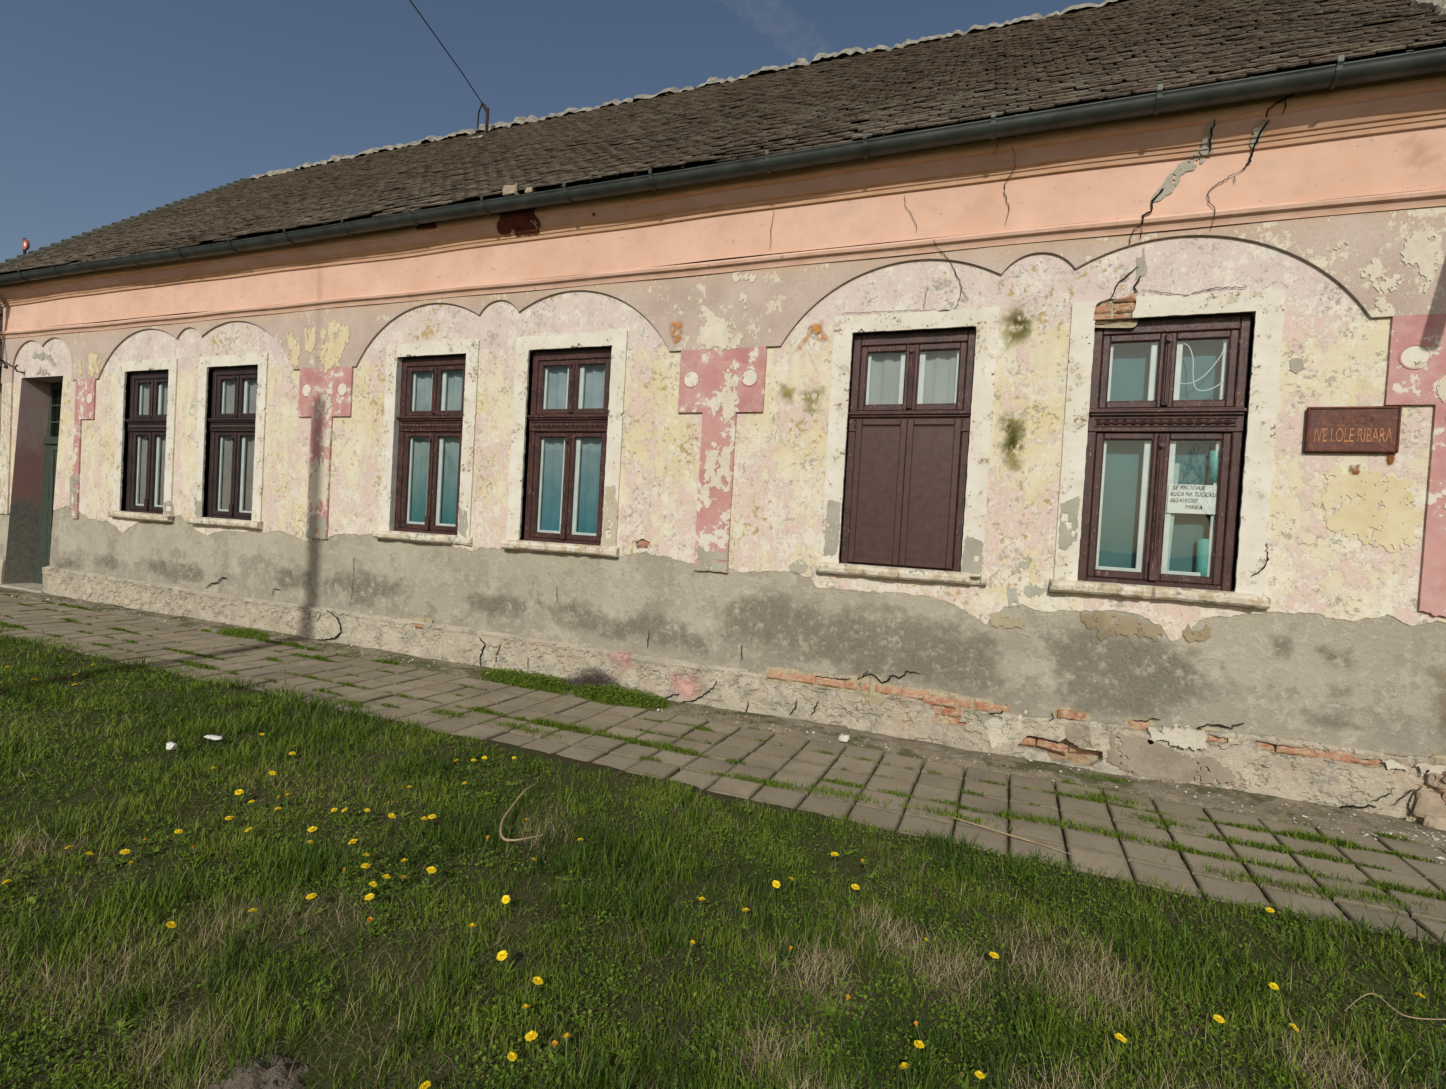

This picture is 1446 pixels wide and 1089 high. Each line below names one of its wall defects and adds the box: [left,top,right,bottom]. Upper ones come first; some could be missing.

crack [1107,93,1296,302]
peeling [1360,227,1442,312]
peeling [286,320,351,373]
peeling [699,271,757,424]
peeling [306,391,333,542]
peeling [700,441,734,509]
peeling [1312,466,1423,553]
flaking render [1080,610,1163,641]
flaking render [1182,624,1212,643]
spalling [763,667,1027,725]
spalling [1019,736,1101,762]
spalling [1255,741,1446,831]